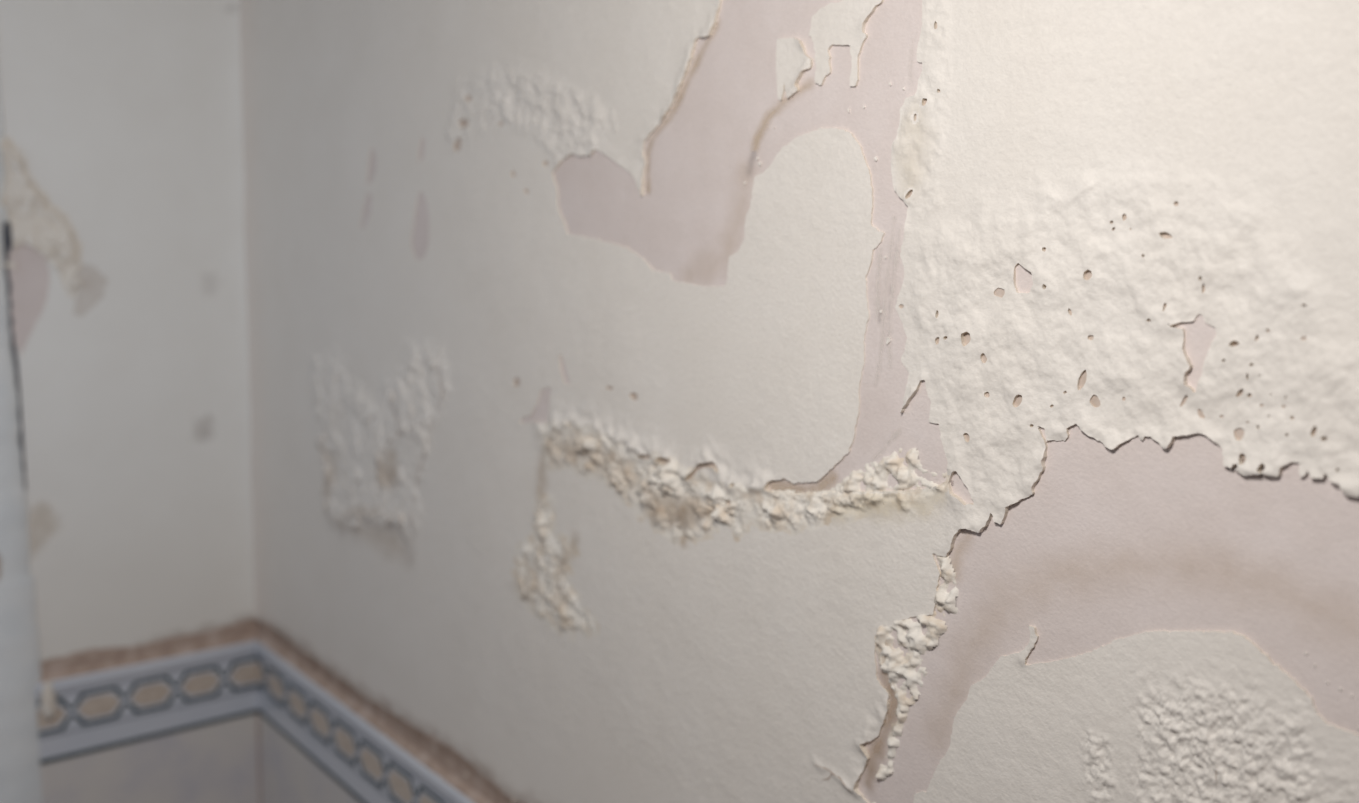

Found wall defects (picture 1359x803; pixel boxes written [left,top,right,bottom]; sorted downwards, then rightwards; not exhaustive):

peeling [0,135,108,358]